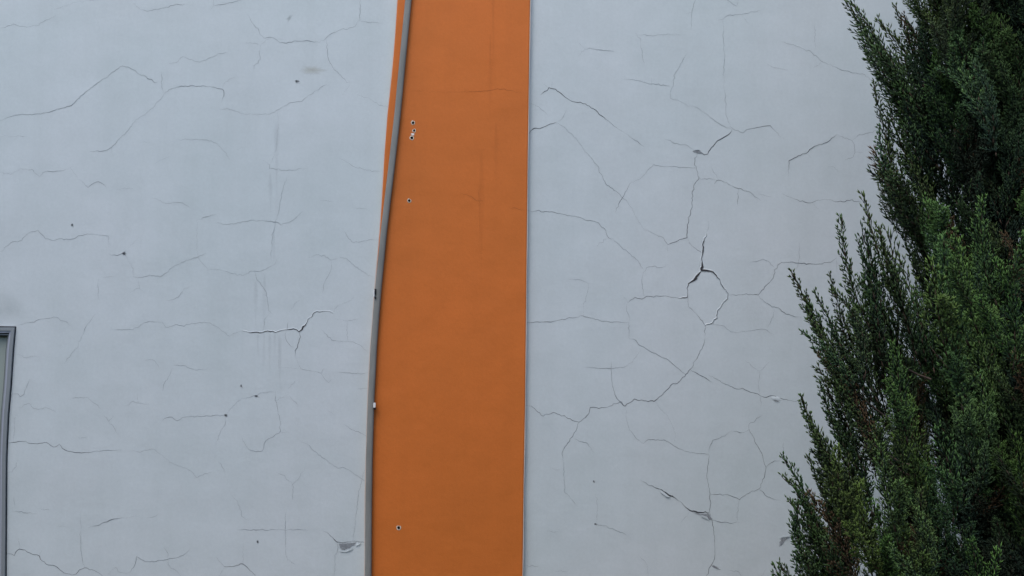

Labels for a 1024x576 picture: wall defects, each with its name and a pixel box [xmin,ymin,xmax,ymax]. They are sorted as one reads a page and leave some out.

crack [4,160,372,453]
crack [470,1,876,575]